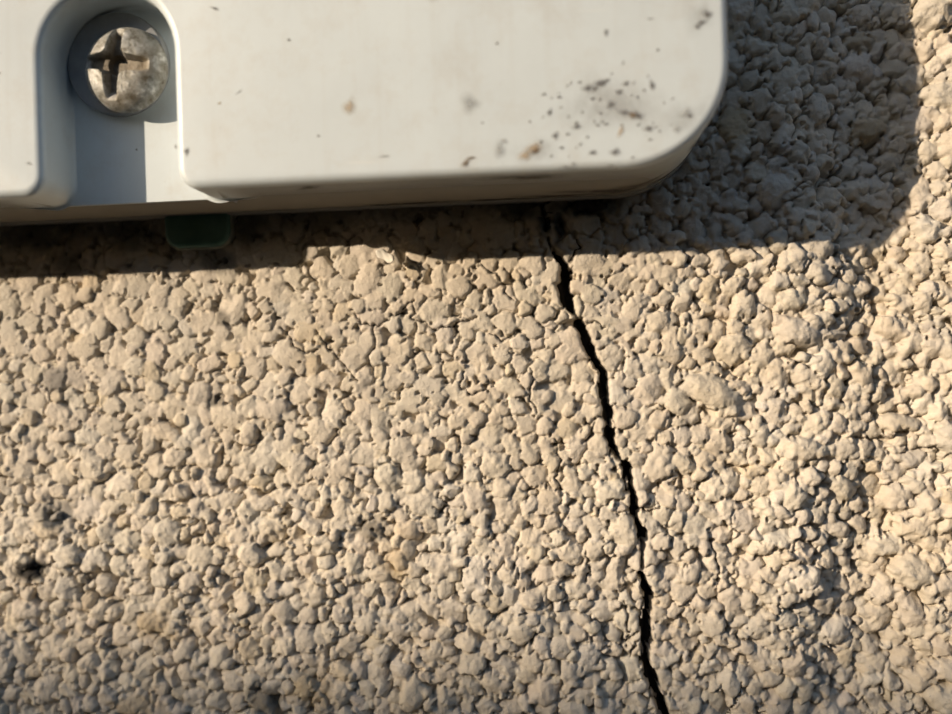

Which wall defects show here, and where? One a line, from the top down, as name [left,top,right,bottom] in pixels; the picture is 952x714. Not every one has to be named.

crack [541,205,660,543]
crack [710,541,720,587]
crack [623,571,669,714]
crack [725,682,742,714]